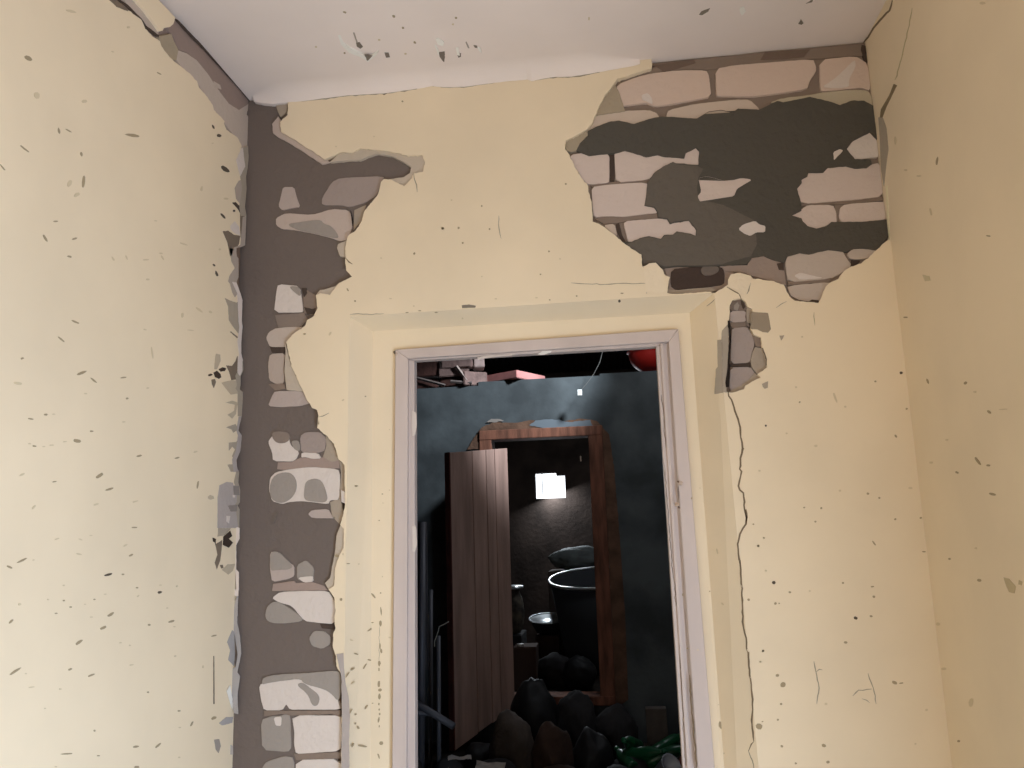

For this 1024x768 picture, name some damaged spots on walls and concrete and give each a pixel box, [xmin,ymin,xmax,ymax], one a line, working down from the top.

flaking render [121,0,425,768]
flaking render [565,43,889,303]
crack [707,283,754,768]
flaking render [714,300,784,394]